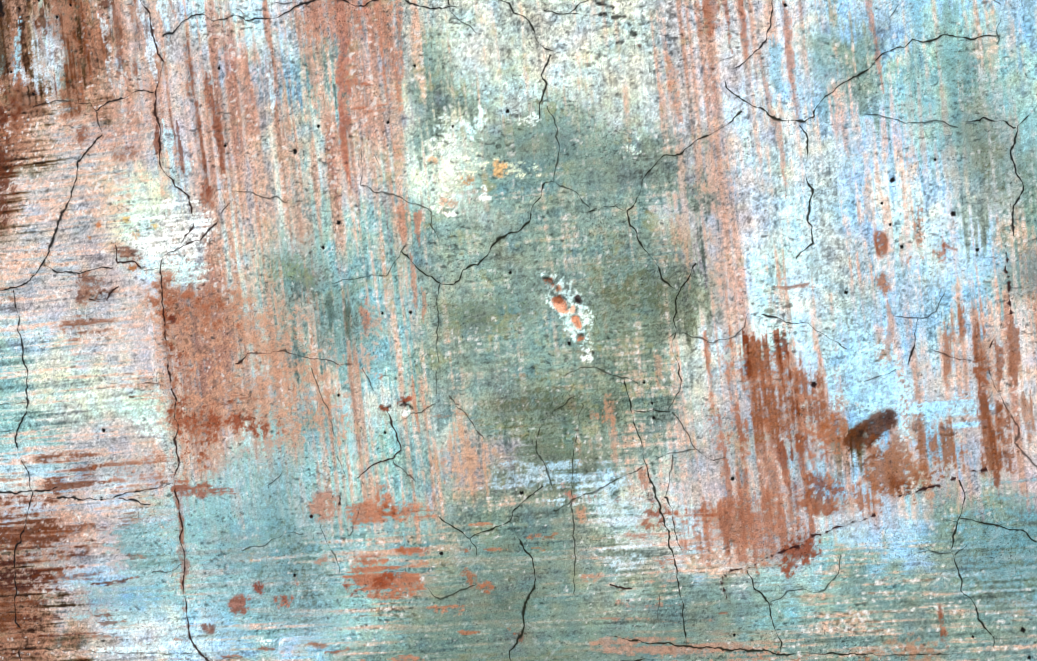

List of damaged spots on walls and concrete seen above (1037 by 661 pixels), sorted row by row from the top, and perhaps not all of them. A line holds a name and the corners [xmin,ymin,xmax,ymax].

crack [0,0,379,661]
crack [235,0,1003,661]
crack [863,105,1037,469]
crack [897,466,1037,647]